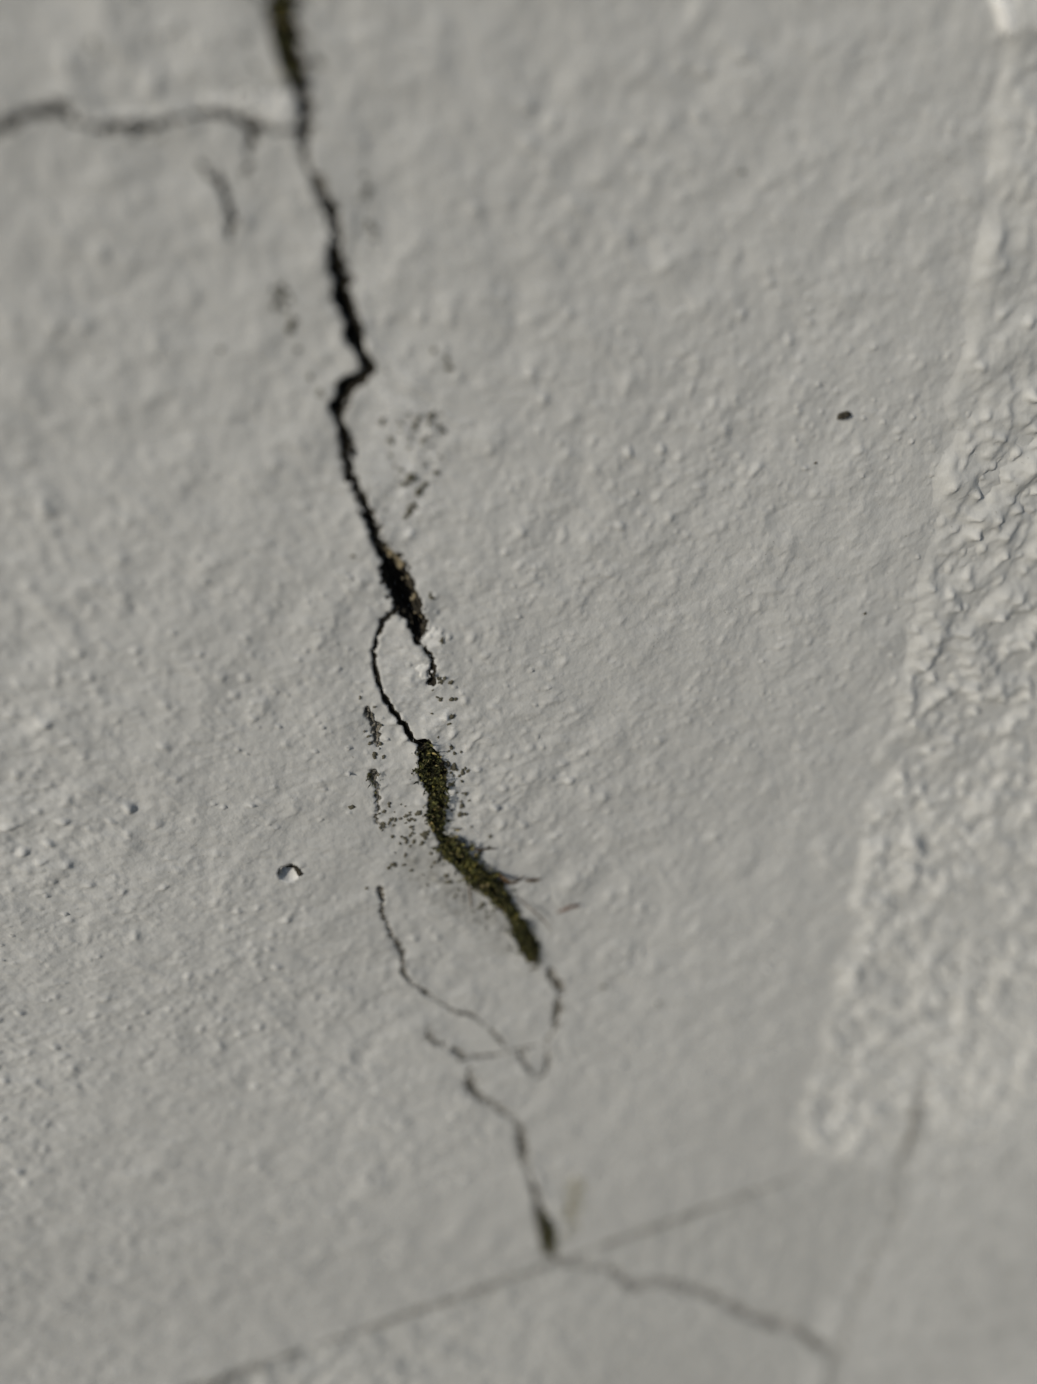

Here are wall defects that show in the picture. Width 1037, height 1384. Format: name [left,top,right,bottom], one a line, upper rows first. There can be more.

crack [0,0,841,1357]